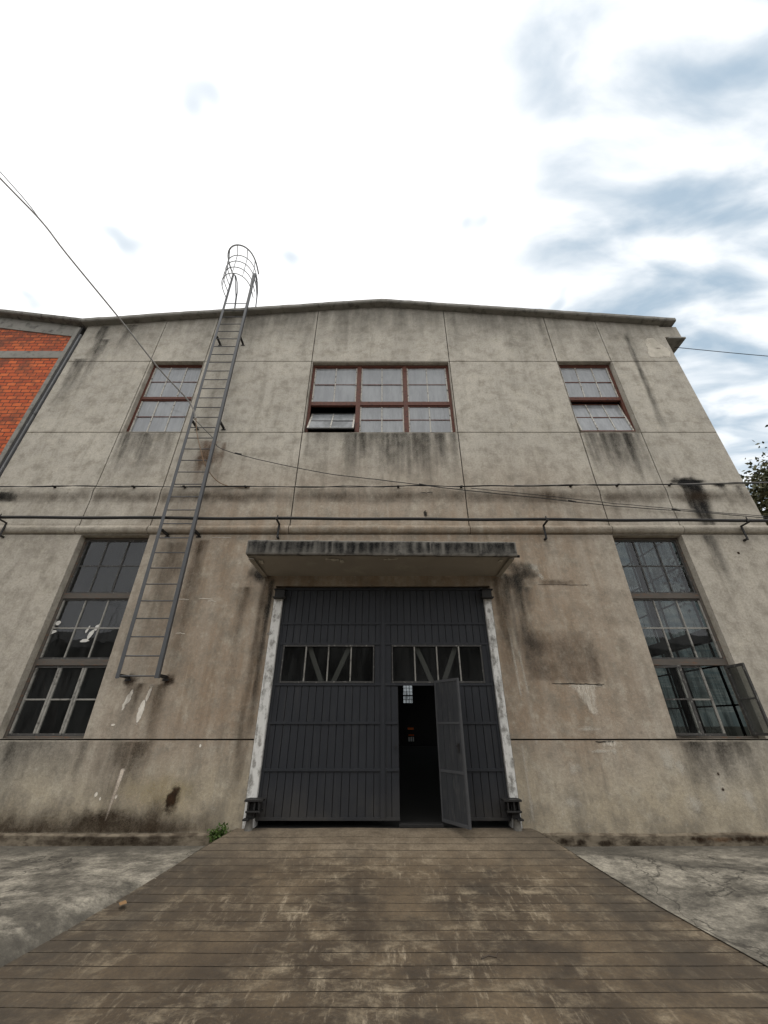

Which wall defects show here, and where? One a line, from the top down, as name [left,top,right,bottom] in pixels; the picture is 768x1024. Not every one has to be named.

damp [673,478,712,523]
damp [495,564,542,612]
peeling [122,687,152,725]
damp [0,812,174,833]